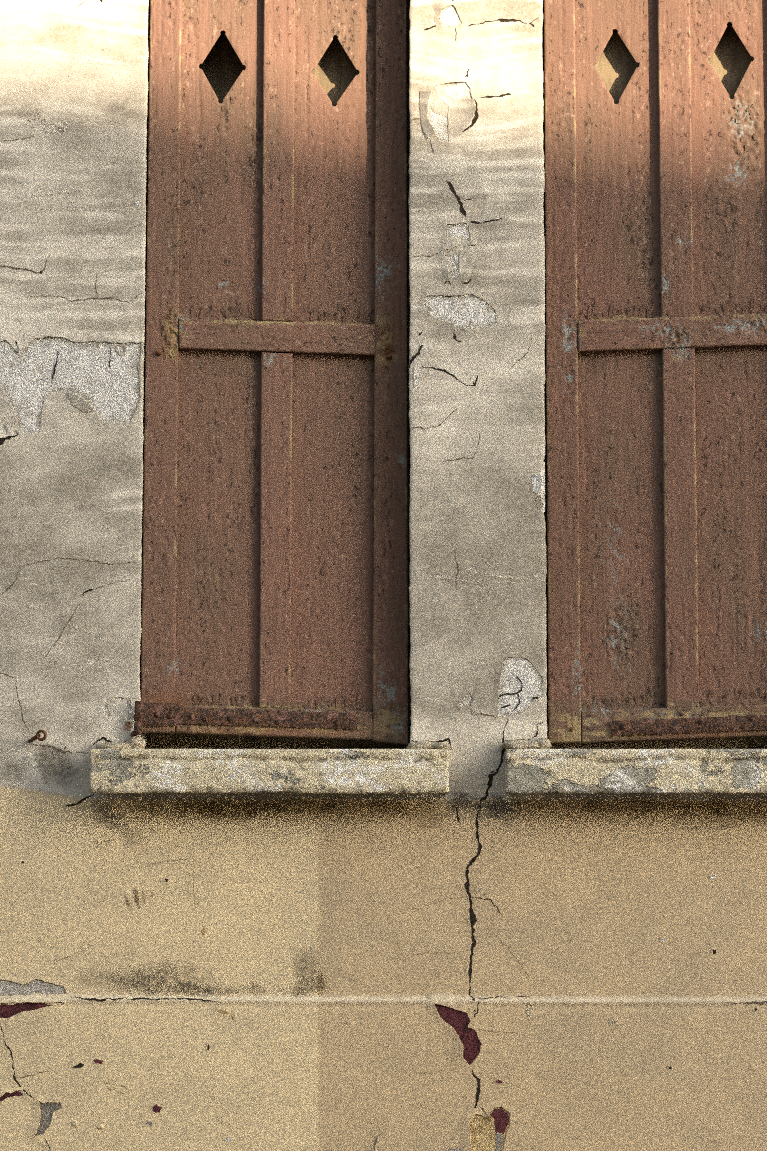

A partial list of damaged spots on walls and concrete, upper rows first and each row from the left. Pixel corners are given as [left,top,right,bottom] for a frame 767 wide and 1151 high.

peeling [417,217,503,338]
peeling [0,324,143,446]
crack [0,553,133,657]
crack [0,673,137,753]
peeling [492,651,545,720]
crack [409,707,543,1033]
peeling [0,970,75,1025]
peeling [425,992,488,1076]
peeling [0,1086,68,1144]
crack [468,1068,481,1109]
peeling [458,1100,515,1151]